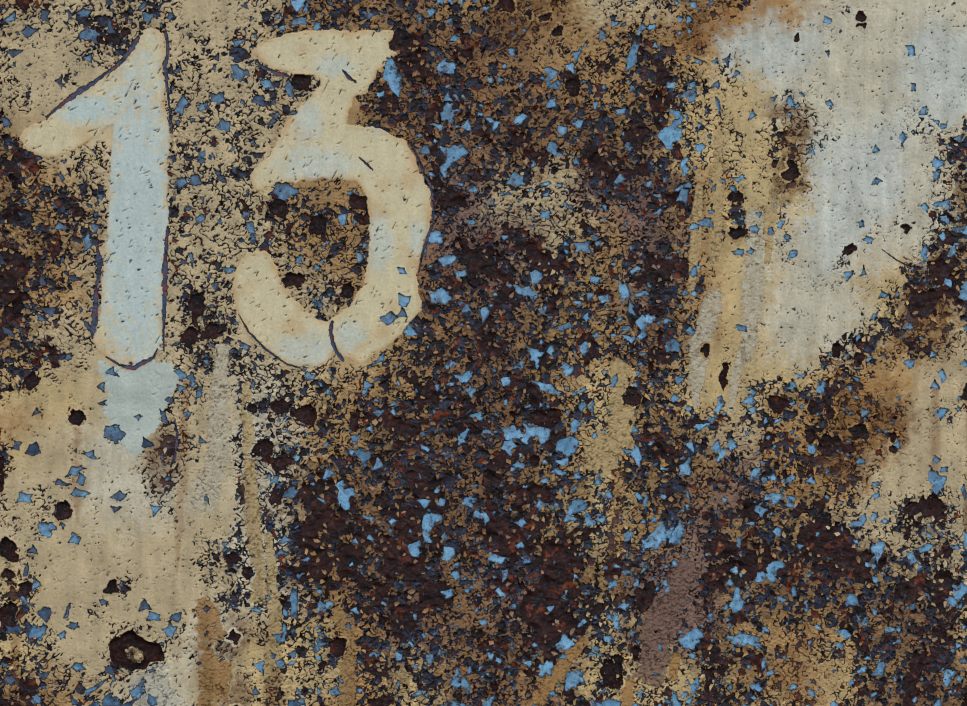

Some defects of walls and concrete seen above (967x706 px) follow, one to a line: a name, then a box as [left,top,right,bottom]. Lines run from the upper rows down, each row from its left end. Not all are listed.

peeling [65,0,175,65]
peeling [166,68,237,238]
rust [377,28,499,210]
rust [578,41,694,215]
rust [0,147,89,342]
spalling [15,448,97,544]
spalling [66,407,89,428]
peeling [104,424,126,445]
peeling [142,253,239,485]
rust [263,219,624,695]
rust [633,422,887,625]
rust [876,497,967,706]